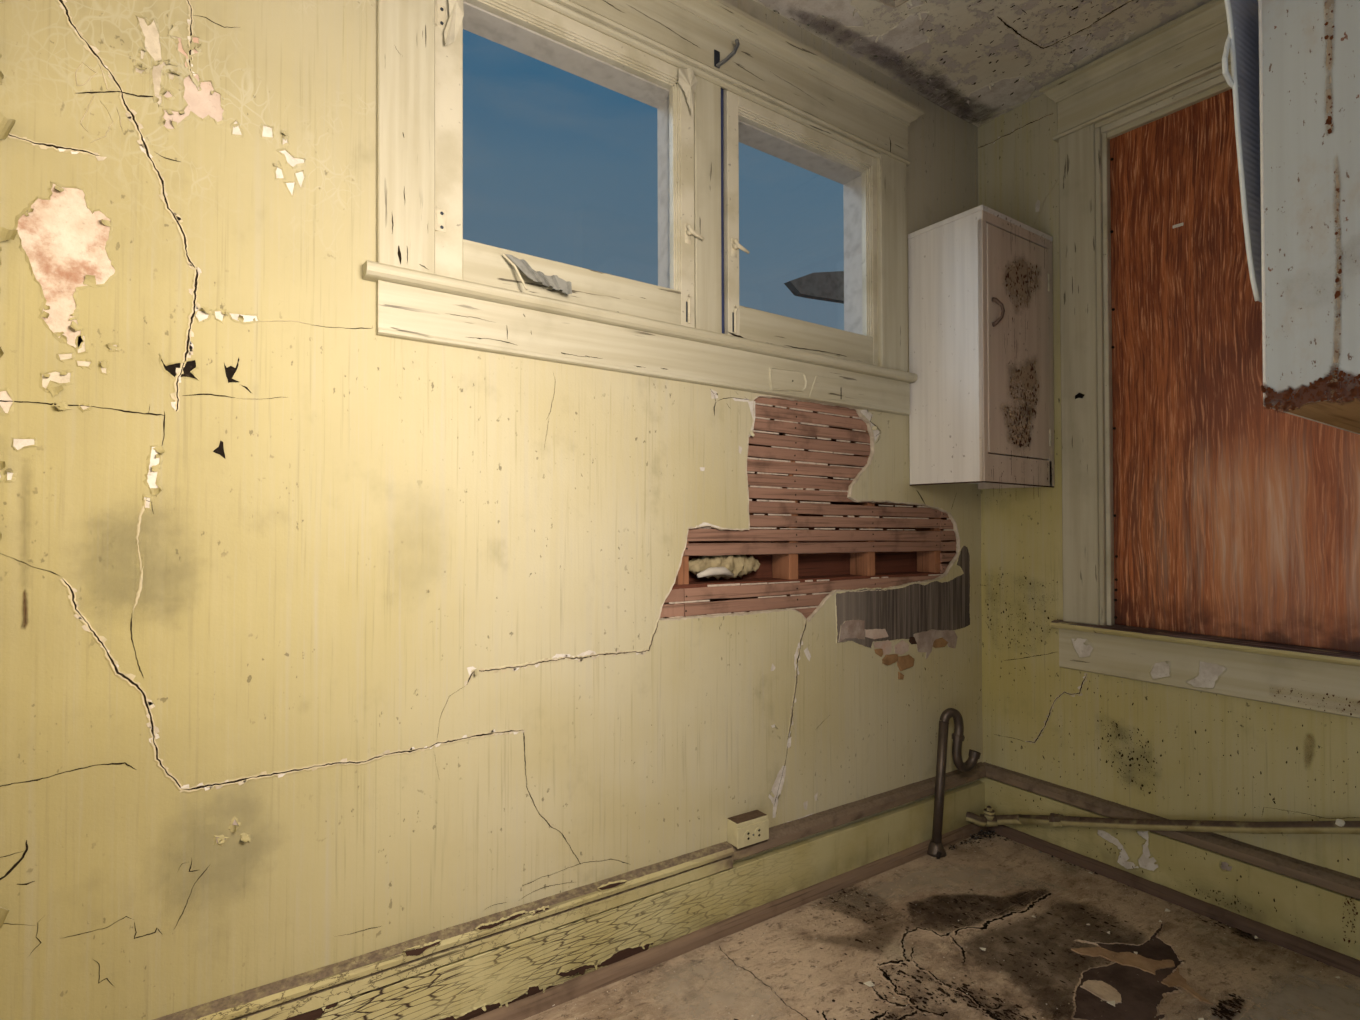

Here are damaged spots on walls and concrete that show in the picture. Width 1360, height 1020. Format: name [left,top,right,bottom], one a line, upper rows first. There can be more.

peeling [133,15,306,198]
leakage [799,15,969,119]
peeling [0,181,121,416]
crack [0,0,279,445]
flaking render [658,389,971,680]
crack [0,498,660,909]
crack [774,620,822,806]
leakage [1097,720,1157,794]
peeling [285,1001,340,1020]
peeling [434,941,655,1020]
crack [868,892,1053,1020]
leakage [811,885,1149,1020]